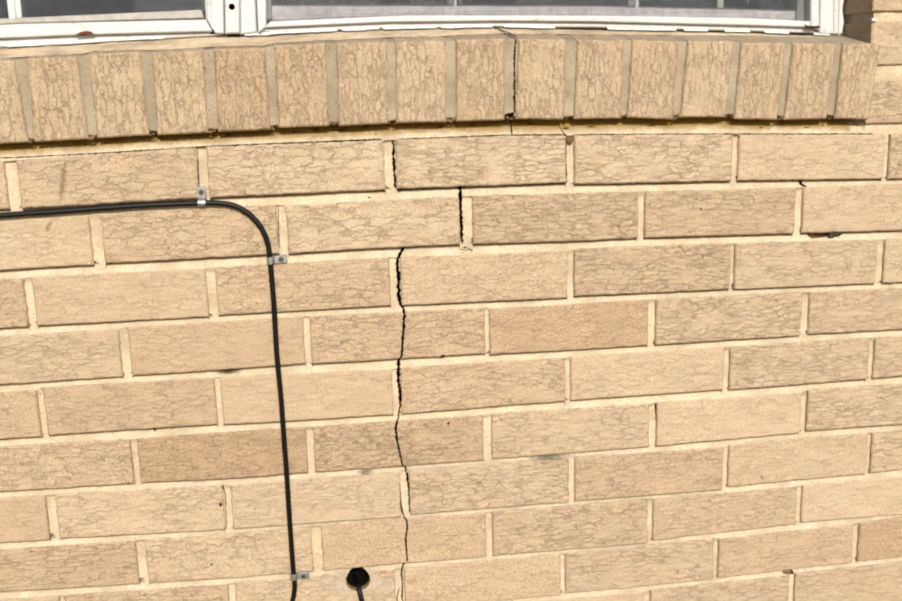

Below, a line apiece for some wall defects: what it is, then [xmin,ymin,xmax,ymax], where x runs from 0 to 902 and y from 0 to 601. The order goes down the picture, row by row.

crack [394,247,410,601]